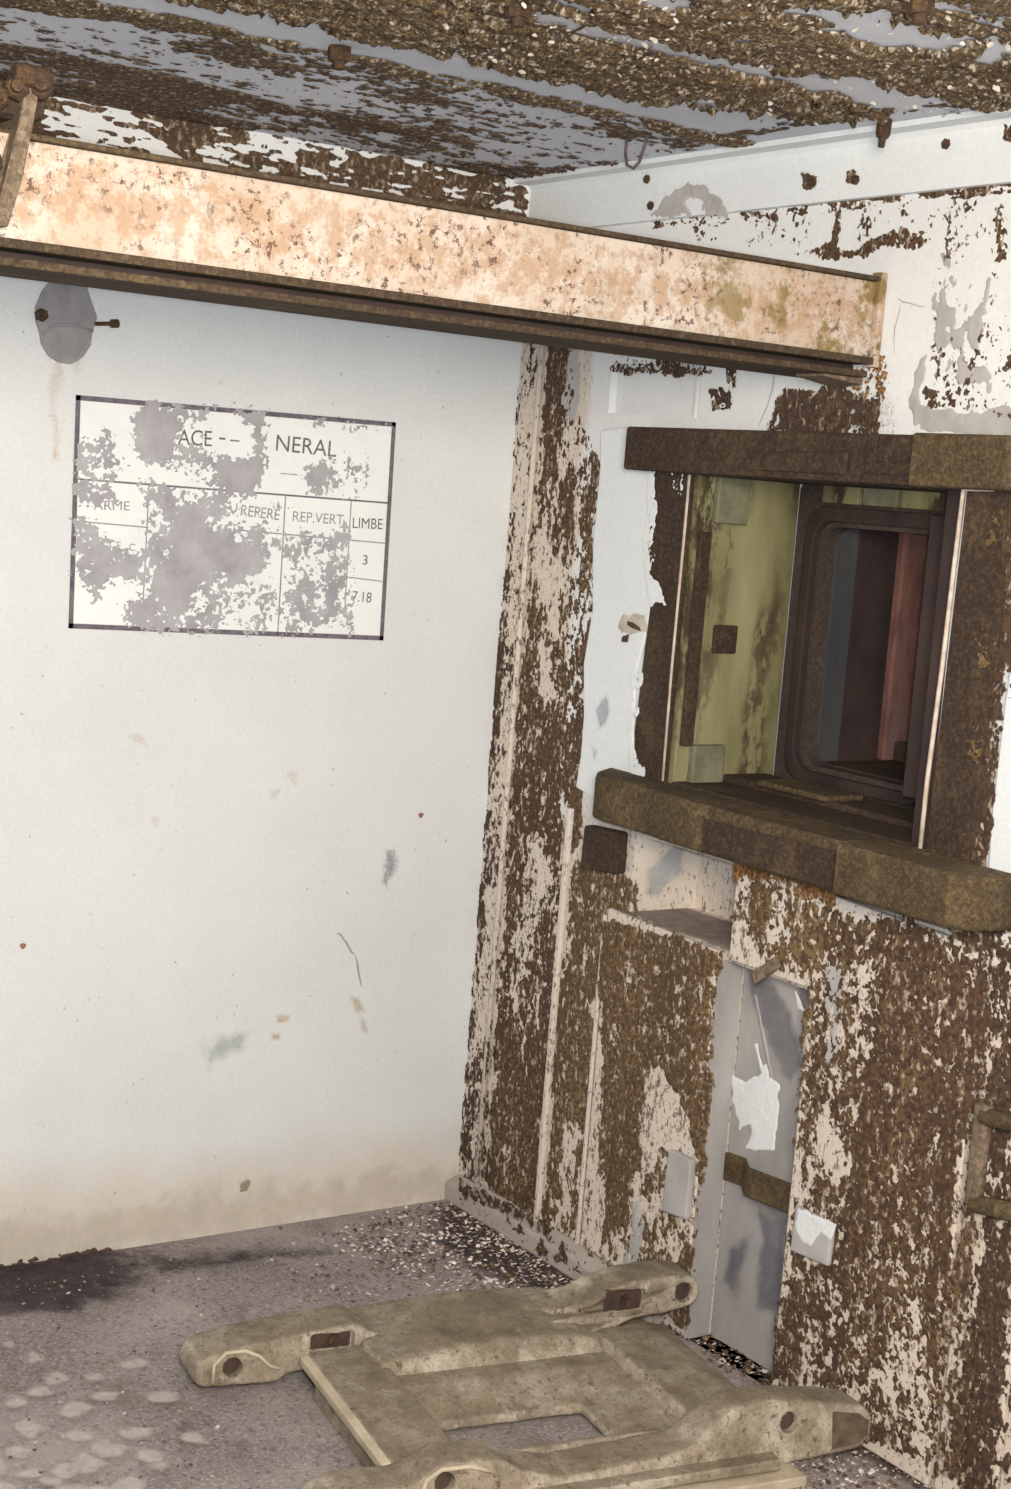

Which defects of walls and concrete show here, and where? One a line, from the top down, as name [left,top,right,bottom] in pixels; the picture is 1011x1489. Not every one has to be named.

corrosion [0,43,619,217]
peeling [0,12,696,156]
peeling [420,0,731,110]
corrosion [652,169,1011,419]
peeling [908,243,1011,435]
peeling [68,400,394,639]
corrosion [960,494,1011,867]
peeling [458,343,602,1274]
corrosion [484,346,738,1274]
leakage [0,1247,139,1314]
leakage [158,1251,292,1270]
corrosion [730,862,1011,1489]